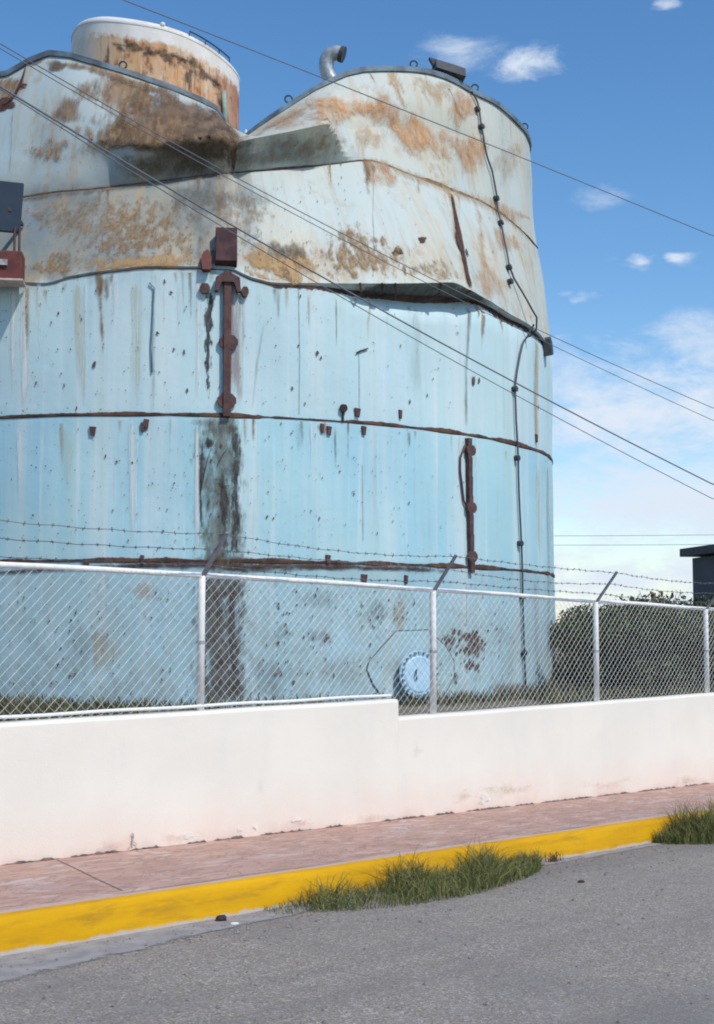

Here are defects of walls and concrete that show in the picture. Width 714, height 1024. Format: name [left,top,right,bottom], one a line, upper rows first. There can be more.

rust [49,40,248,157]
rust [258,71,487,171]
rust [364,159,518,247]
rust [33,190,215,339]
rust [245,224,542,434]
leakage [195,421,246,700]
rust [441,628,488,684]